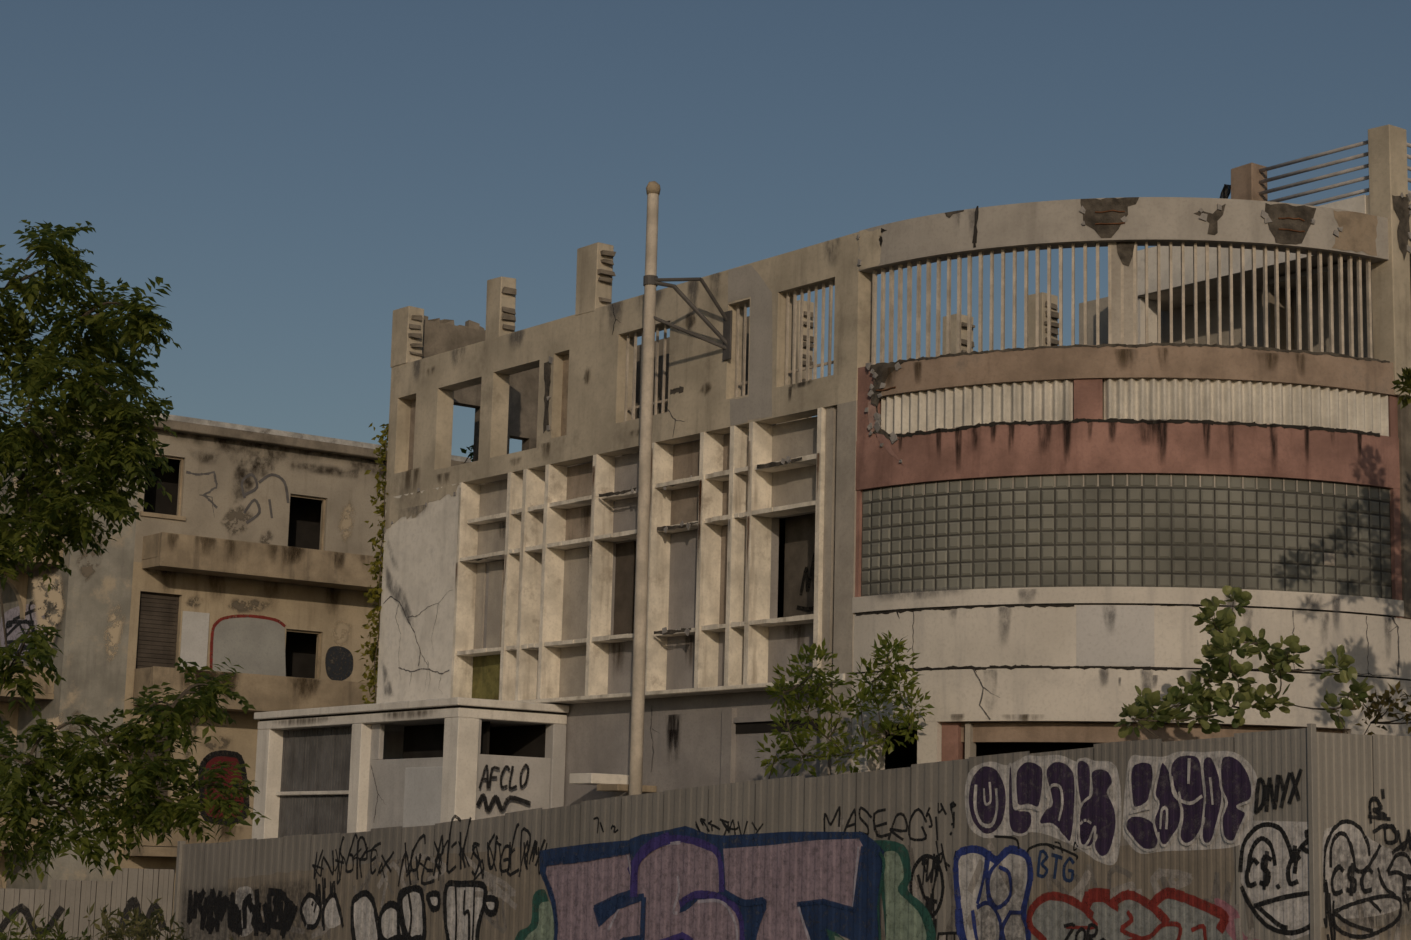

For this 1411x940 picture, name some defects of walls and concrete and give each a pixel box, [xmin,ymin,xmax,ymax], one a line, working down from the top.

spalling [1079,197,1139,266]
spalling [1193,203,1226,235]
spalling [1261,203,1316,244]
peeling [1332,210,1378,256]
spalling [1392,193,1411,260]
spalling [864,359,904,444]
damp [937,424,1014,457]
damp [1044,420,1071,451]
damp [1150,419,1167,448]
crack [383,596,449,685]
crack [905,665,1183,720]